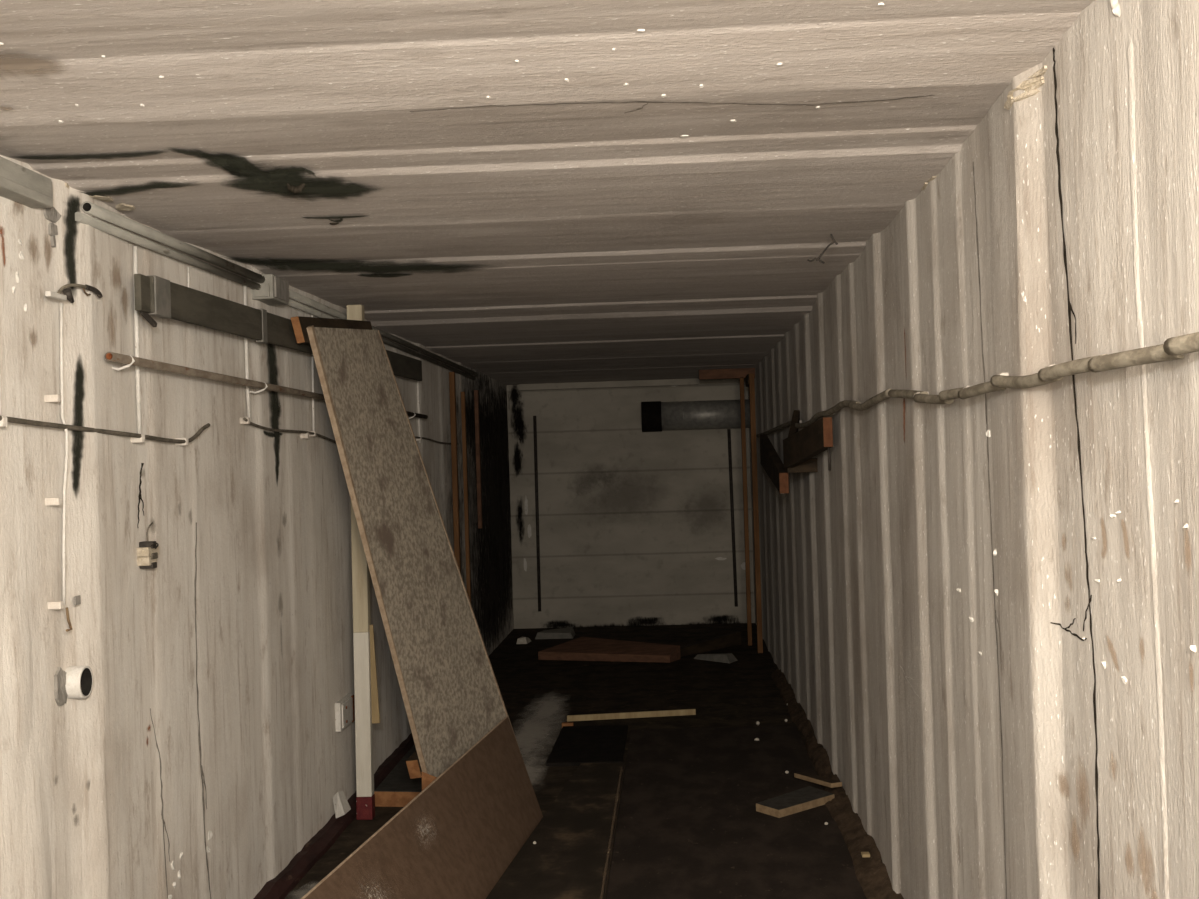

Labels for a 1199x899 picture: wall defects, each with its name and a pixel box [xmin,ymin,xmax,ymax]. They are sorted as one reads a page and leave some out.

leakage [31,241,50,264]
leakage [65,182,193,293]
leakage [13,149,377,198]
leakage [72,360,84,493]
leakage [264,343,282,483]
leakage [450,366,524,651]
crack [1051,47,1100,899]